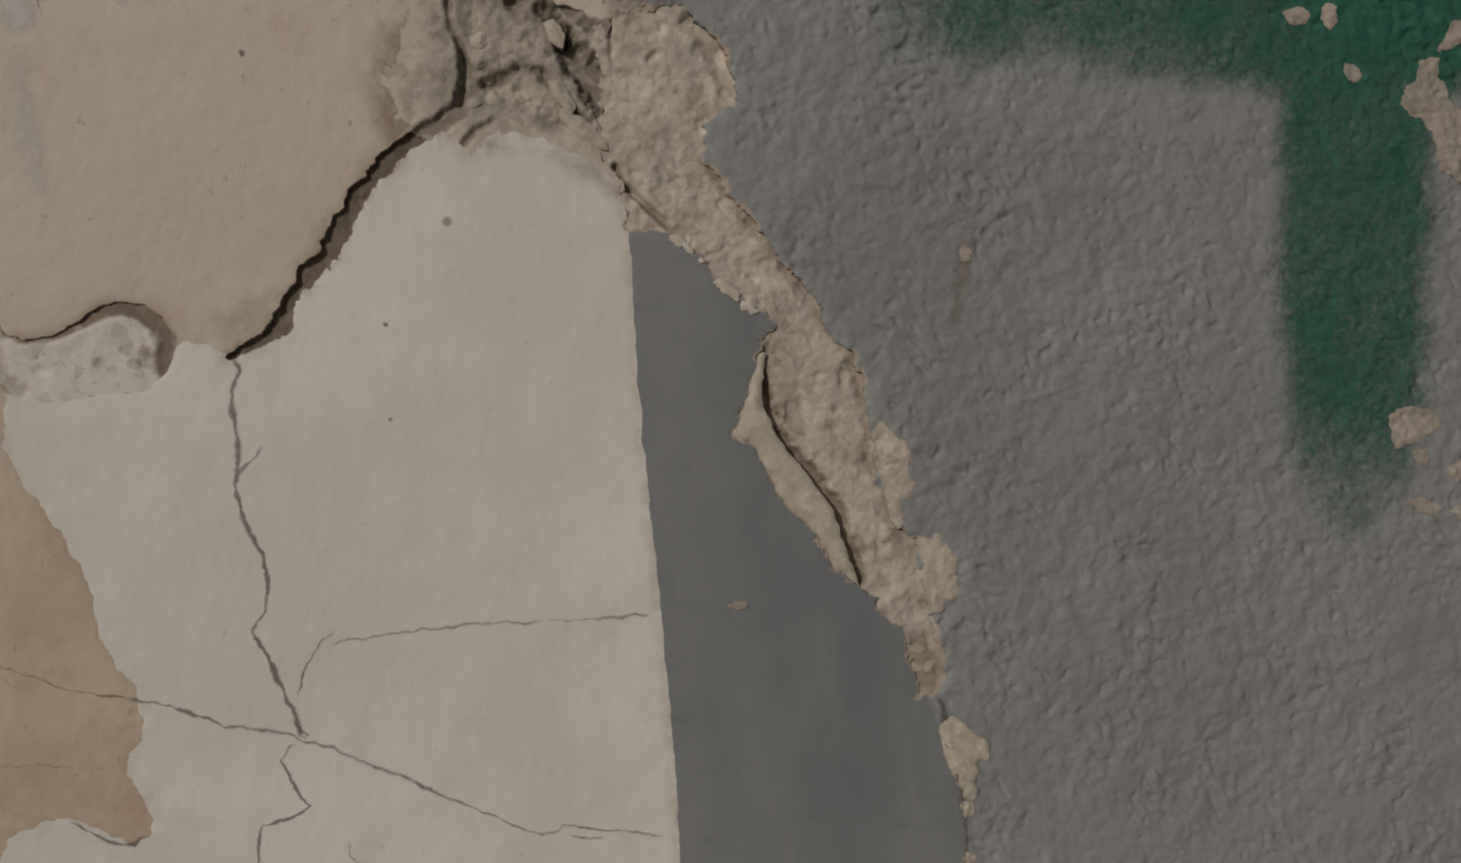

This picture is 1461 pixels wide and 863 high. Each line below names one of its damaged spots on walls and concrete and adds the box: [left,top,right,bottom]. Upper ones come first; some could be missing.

peeling [1282,3,1338,30]
peeling [1343,63,1362,83]
peeling [1400,20,1461,183]
peeling [0,0,959,697]
crack [99,132,428,863]
peeling [1388,406,1441,464]
peeling [0,384,153,860]
spalling [939,716,990,817]